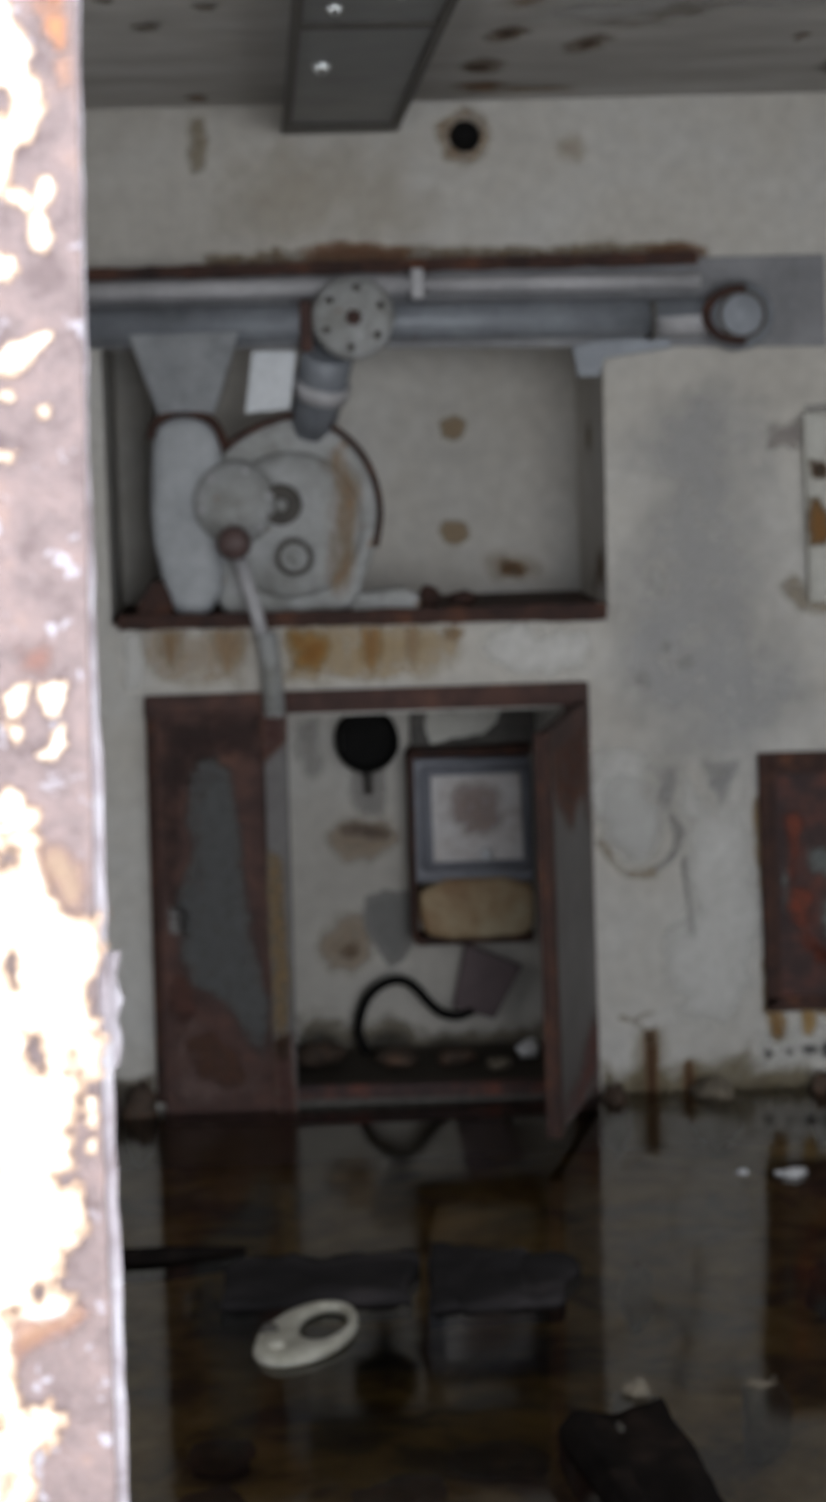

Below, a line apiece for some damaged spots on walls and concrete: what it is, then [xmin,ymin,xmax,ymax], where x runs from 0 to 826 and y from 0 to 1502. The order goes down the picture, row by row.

corrosion [37,0,68,80]
peeling [0,0,57,284]
corrosion [207,242,705,265]
peeling [0,330,53,403]
peeling [35,403,51,420]
peeling [0,450,20,464]
corrosion [283,626,463,679]
peeling [2,680,69,762]
peeling [0,785,123,1502]